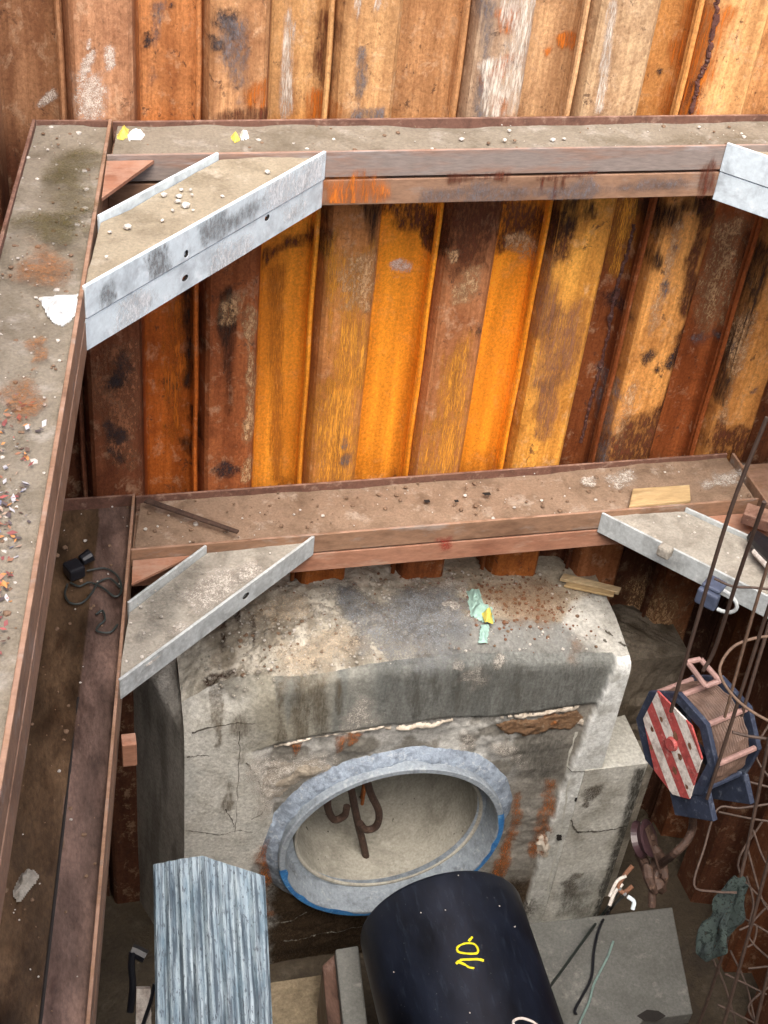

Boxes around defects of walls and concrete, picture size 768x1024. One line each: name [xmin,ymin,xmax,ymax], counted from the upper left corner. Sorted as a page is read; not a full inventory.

corrosion [661,0,735,115]
corrosion [179,404,201,454]
corrosion [182,287,206,388]
corrosion [217,287,237,371]
corrosion [262,226,374,482]
corrosion [411,338,471,475]
corrosion [327,171,597,439]
corrosion [579,198,641,443]
spalling [496,705,584,736]
crack [187,722,266,835]
corrosion [528,781,556,858]
crack [570,820,630,833]